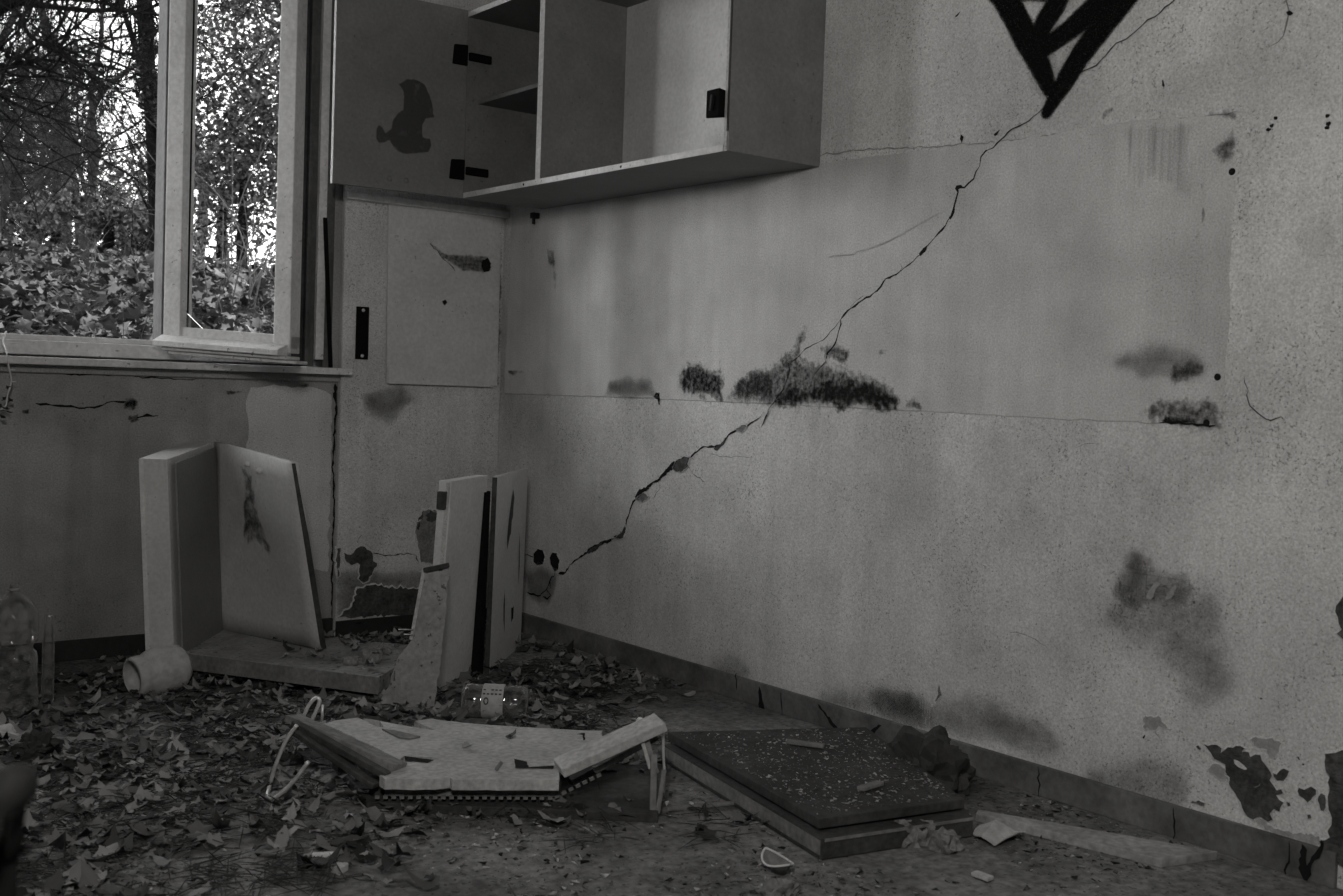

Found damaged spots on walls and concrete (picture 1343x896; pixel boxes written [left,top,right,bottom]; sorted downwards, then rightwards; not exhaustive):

crack [1269,0,1289,47]
crack [558,0,1174,575]
damp [680,337,919,411]
damp [1159,359,1202,379]
damp [1150,402,1217,427]
crack [1244,378,1282,421]
flaking render [414,507,437,565]
flaking render [333,544,419,620]
spalling [1334,587,1343,640]
peeling [1195,736,1343,866]